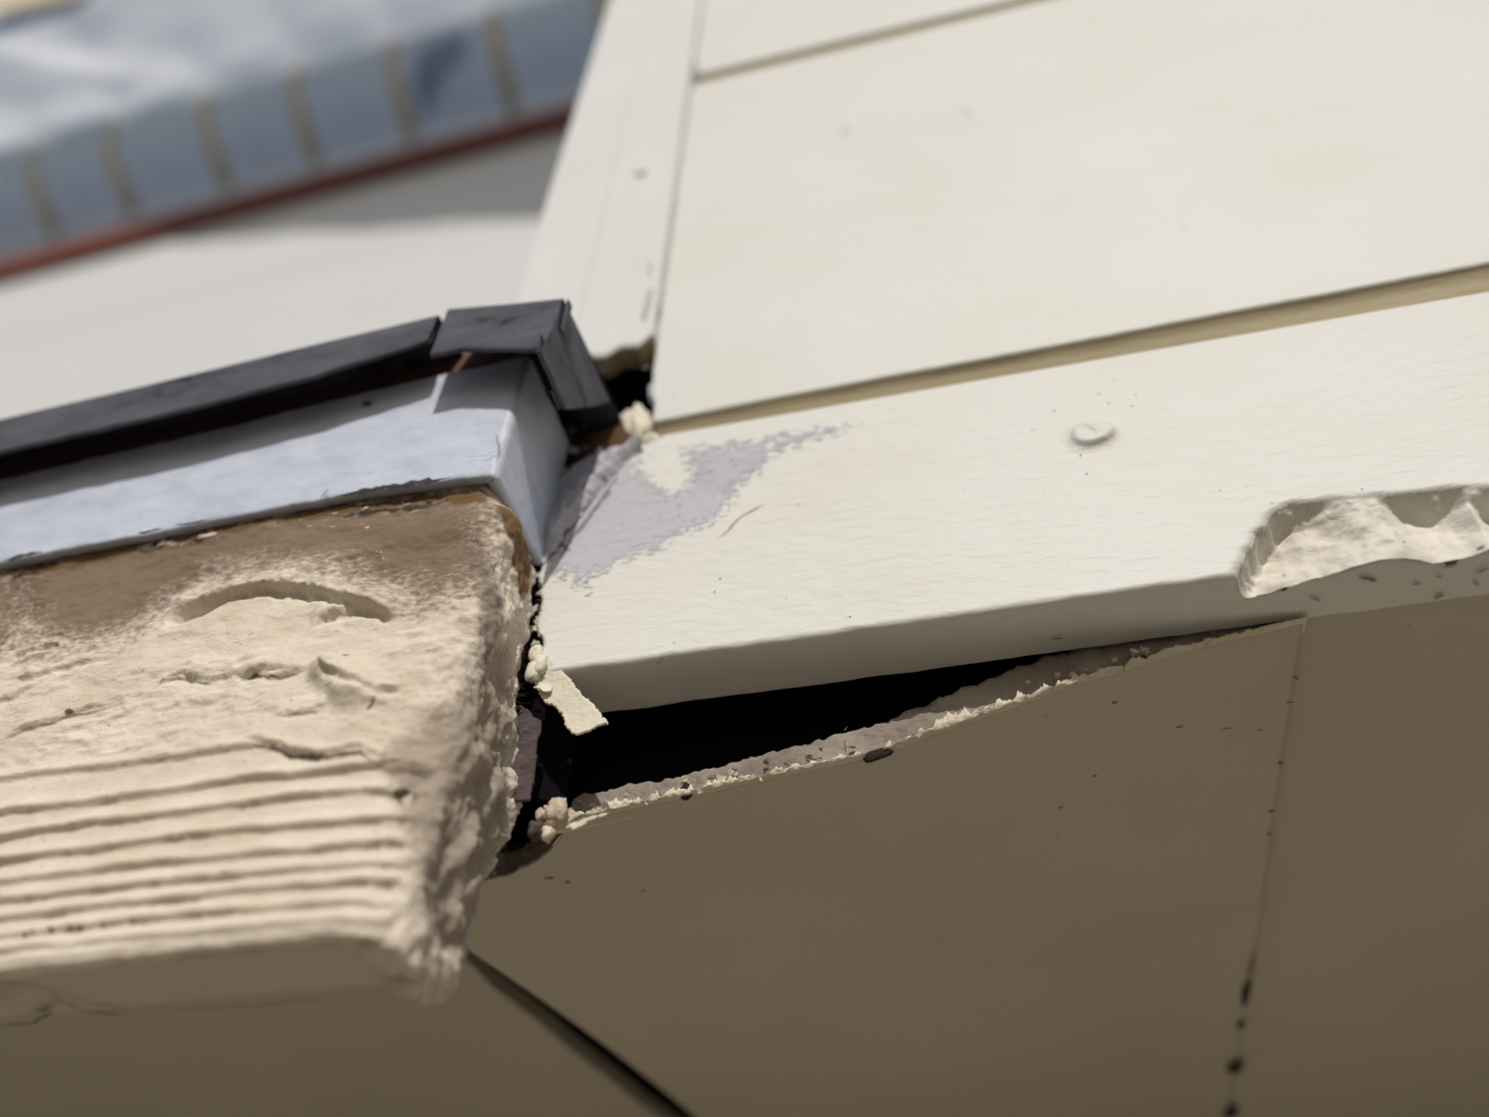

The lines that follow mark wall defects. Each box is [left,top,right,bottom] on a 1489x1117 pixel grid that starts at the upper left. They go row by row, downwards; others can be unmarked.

spalling [1237,489,1489,598]
crack [515,563,576,801]